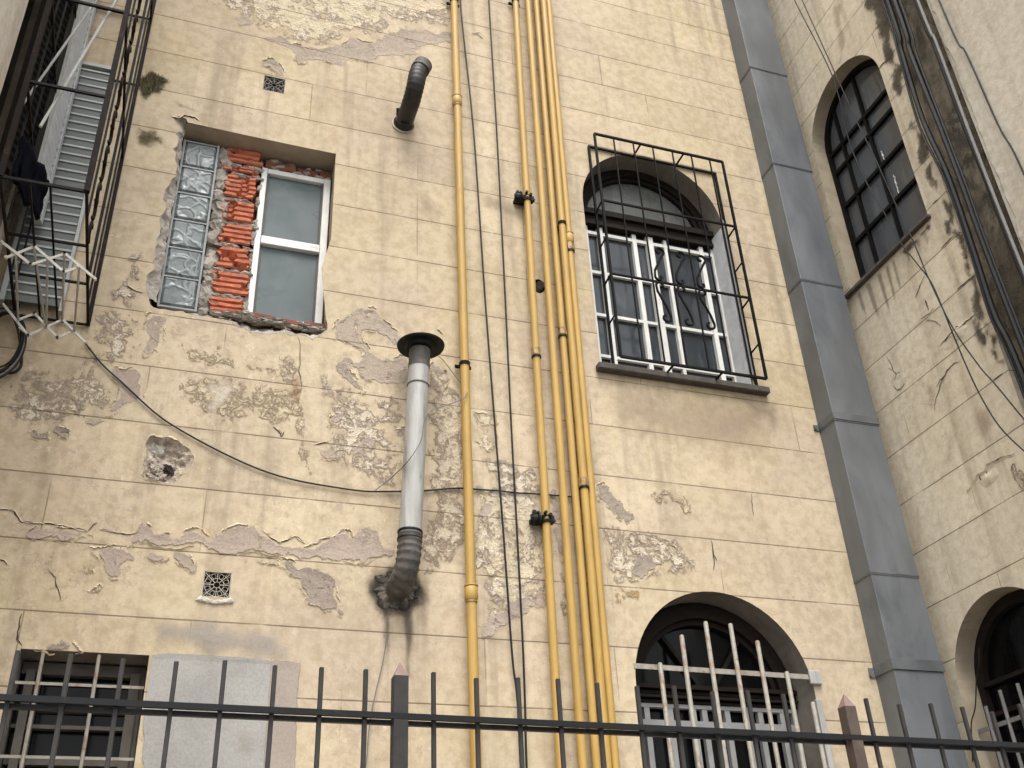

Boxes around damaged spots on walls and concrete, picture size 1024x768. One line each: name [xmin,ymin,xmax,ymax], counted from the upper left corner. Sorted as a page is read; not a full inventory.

peeling [206,0,452,75]
peeling [10,253,167,443]
peeling [178,306,408,487]
crack [915,277,974,409]
spalling [141,434,195,484]
peeling [26,522,394,619]
peeling [422,361,567,639]
peeling [595,481,695,583]
spalling [1010,462,1024,490]